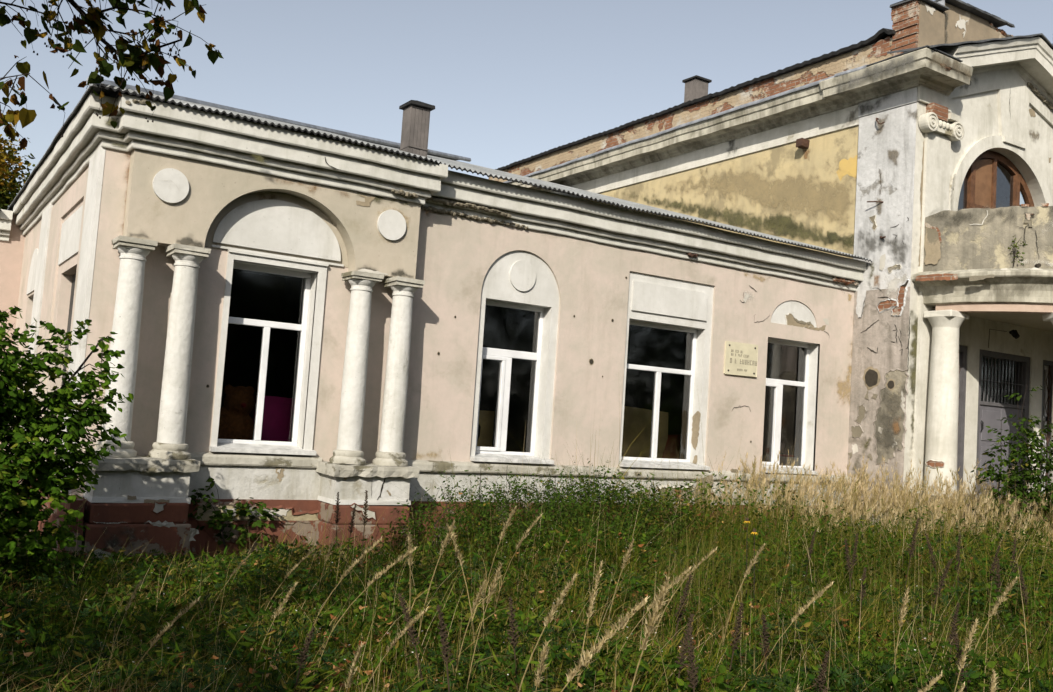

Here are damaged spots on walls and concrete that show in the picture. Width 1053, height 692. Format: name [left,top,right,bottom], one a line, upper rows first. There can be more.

flaking render [742,77,774,92]
flaking render [664,100,709,130]
damp [768,214,796,228]
peeling [877,134,1008,317]
damp [938,210,972,224]
peeling [832,276,866,318]
peeling [785,313,826,331]
spalling [127,495,176,528]
spalling [189,502,319,544]
spalling [349,503,377,520]